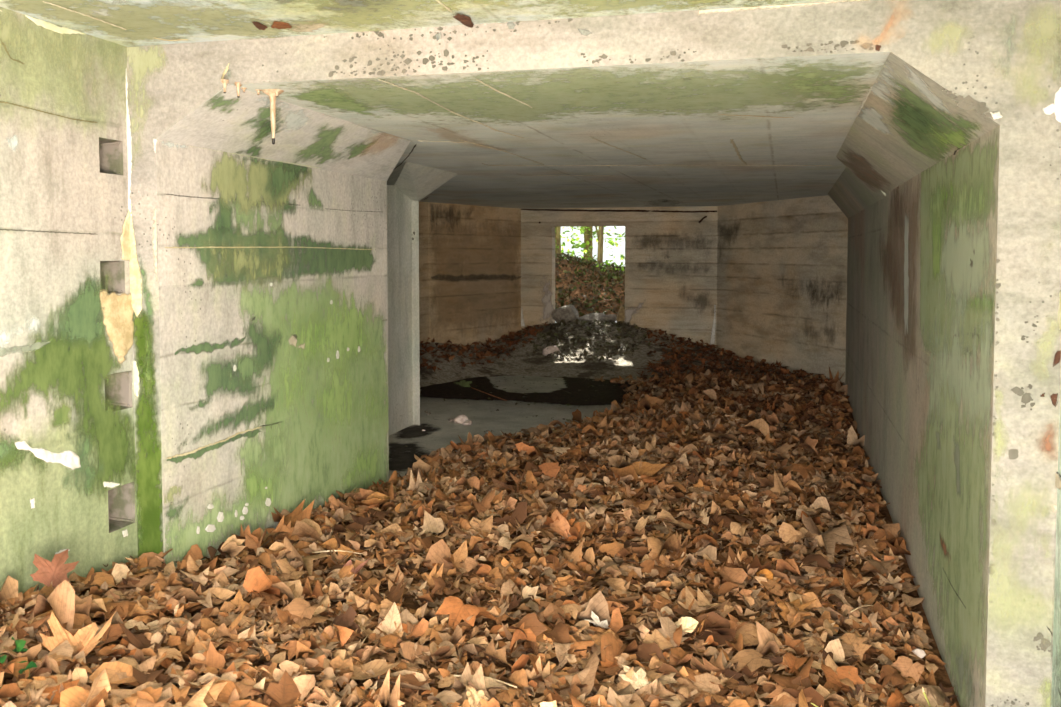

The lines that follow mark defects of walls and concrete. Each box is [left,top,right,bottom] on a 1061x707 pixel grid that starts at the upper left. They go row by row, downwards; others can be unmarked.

damp [25,15,85,34]
damp [857,65,972,152]
damp [210,88,377,235]
damp [175,336,246,355]
damp [882,179,994,495]
damp [52,404,72,427]
damp [0,437,122,490]
damp [167,429,261,464]
damp [122,498,142,540]
damp [196,503,249,534]